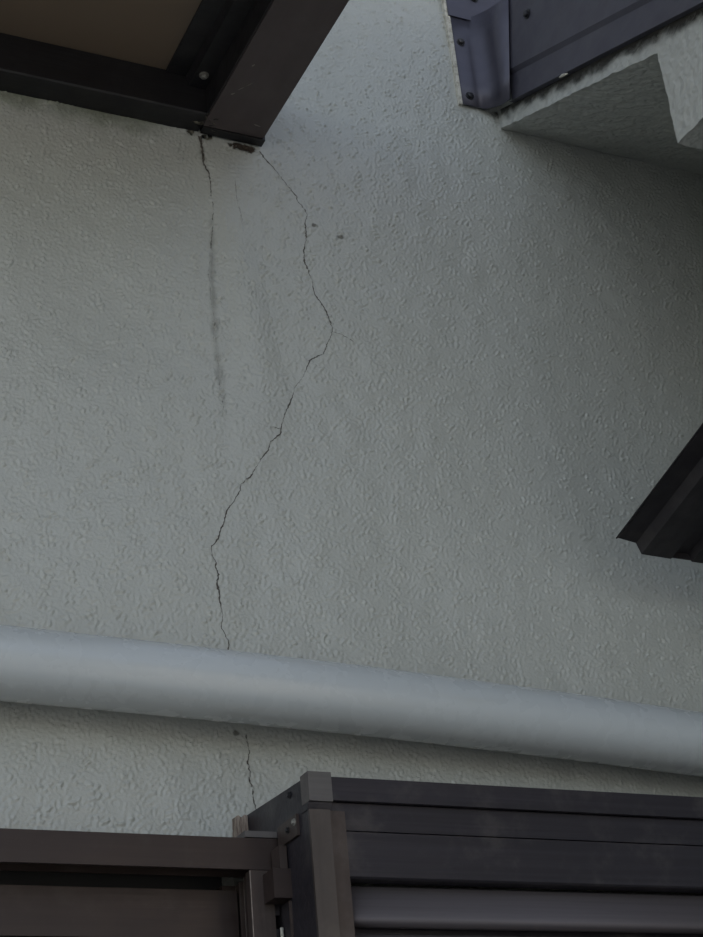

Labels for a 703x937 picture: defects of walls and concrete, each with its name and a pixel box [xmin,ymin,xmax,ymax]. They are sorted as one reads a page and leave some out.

crack [198,136,214,248]
crack [211,151,354,650]
crack [245,734,256,809]